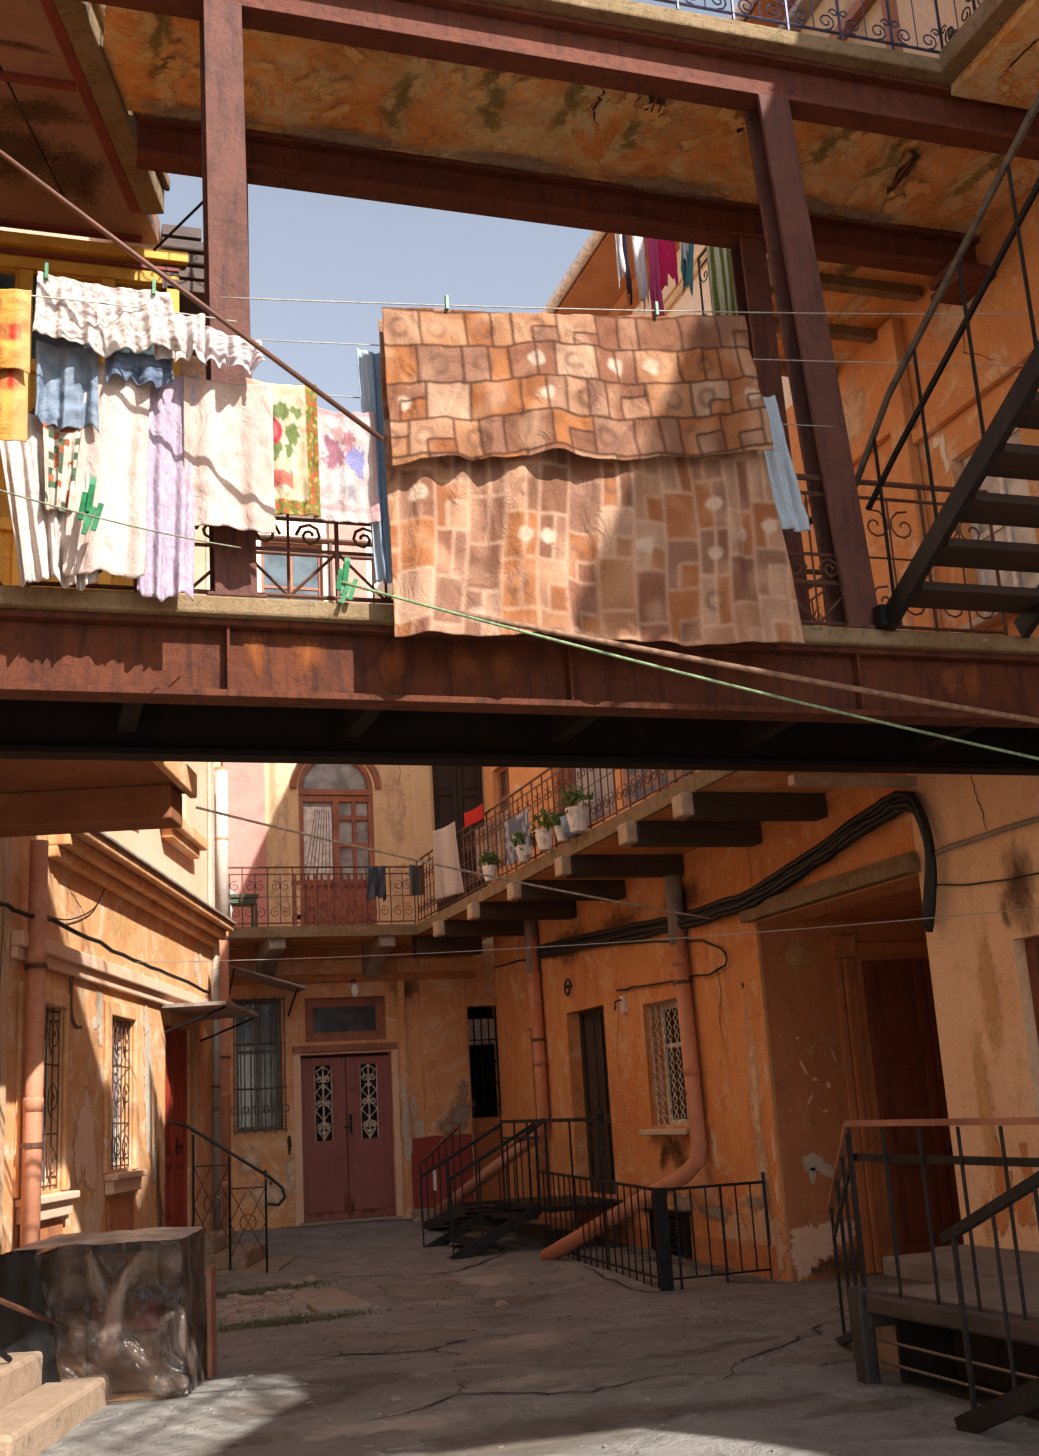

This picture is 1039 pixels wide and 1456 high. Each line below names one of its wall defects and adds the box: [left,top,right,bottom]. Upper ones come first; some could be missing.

damp [0,97,102,204]
corrosion [247,635,264,671]
corrosion [296,642,320,670]
damp [1002,860,1030,928]
damp [974,939,1002,1173]
flaking render [721,1129,861,1282]